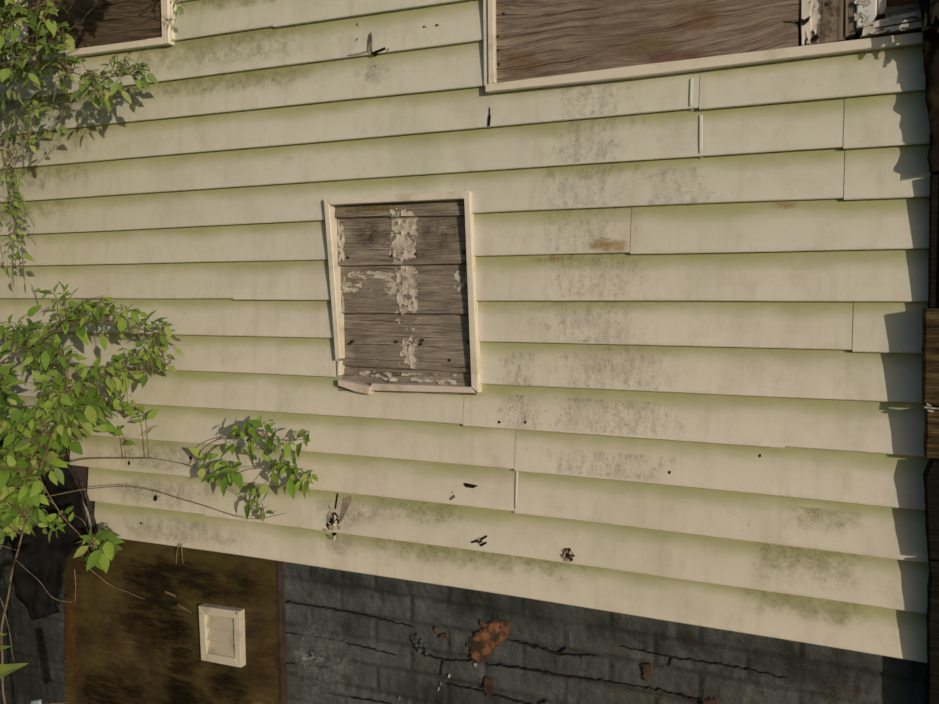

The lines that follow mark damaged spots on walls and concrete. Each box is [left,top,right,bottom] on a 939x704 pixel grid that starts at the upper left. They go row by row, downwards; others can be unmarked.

peeling [800,0,822,45]
peeling [854,0,922,36]
peeling [341,208,457,385]
peeling [454,267,467,292]
spalling [467,619,512,667]